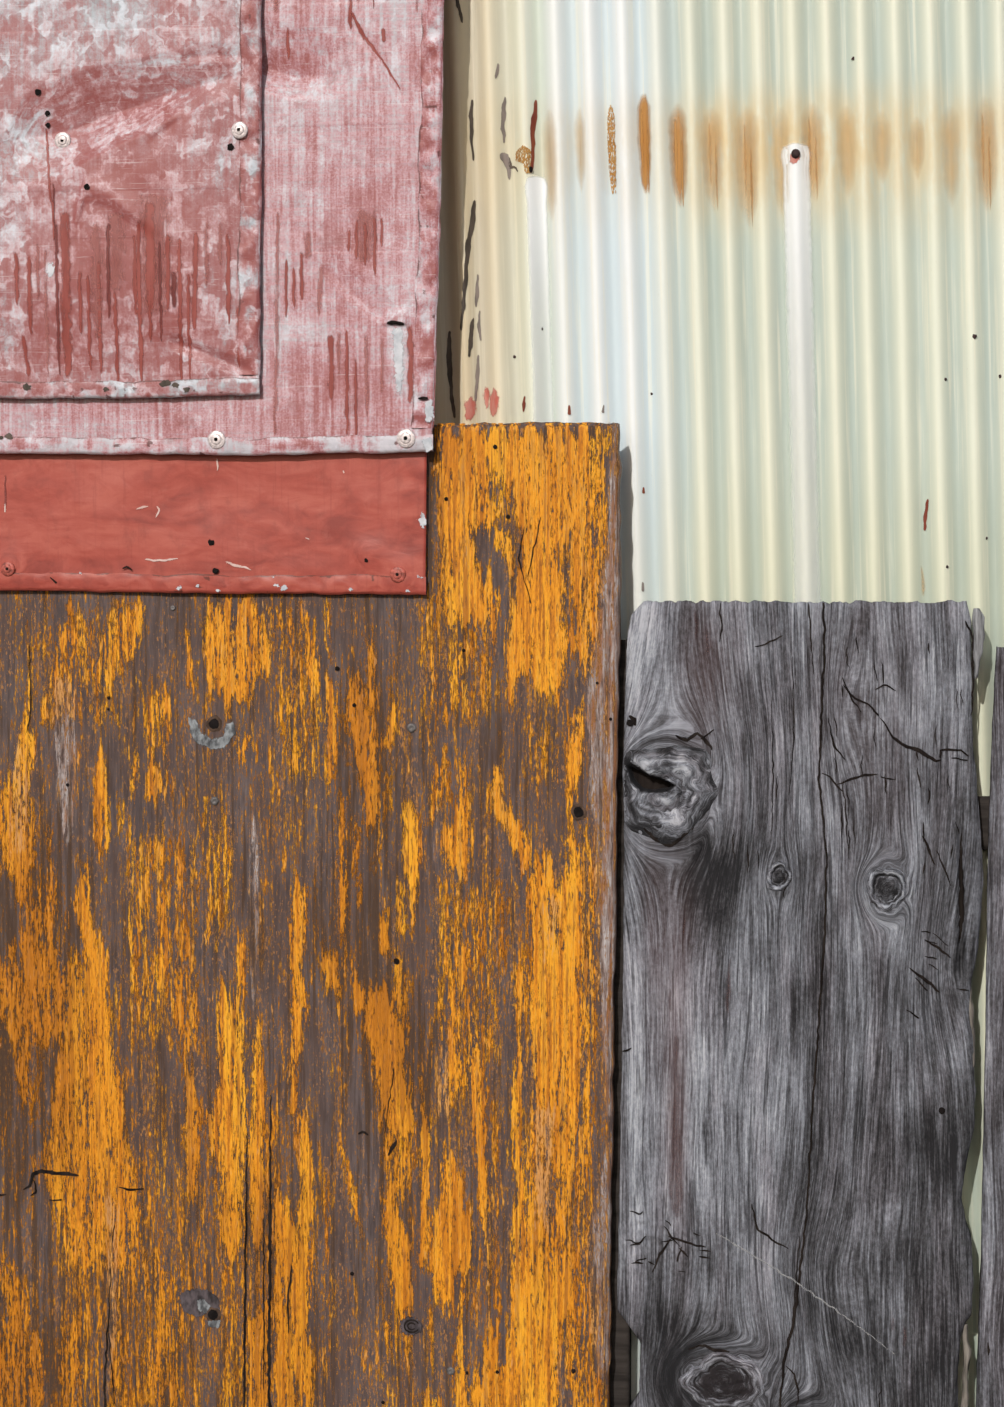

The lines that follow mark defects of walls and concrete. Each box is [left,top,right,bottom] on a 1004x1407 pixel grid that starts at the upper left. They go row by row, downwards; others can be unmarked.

corrosion [607,105,616,194]
corrosion [639,97,650,190]
corrosion [672,115,685,205]
peeling [391,326,404,394]
crack [717,603,725,642]
crack [675,729,714,750]
crack [644,827,694,847]
peeling [0,399,615,1407]
crack [732,603,975,1407]
crack [0,1169,79,1201]
crack [626,1211,711,1272]
crack [689,1344,729,1353]